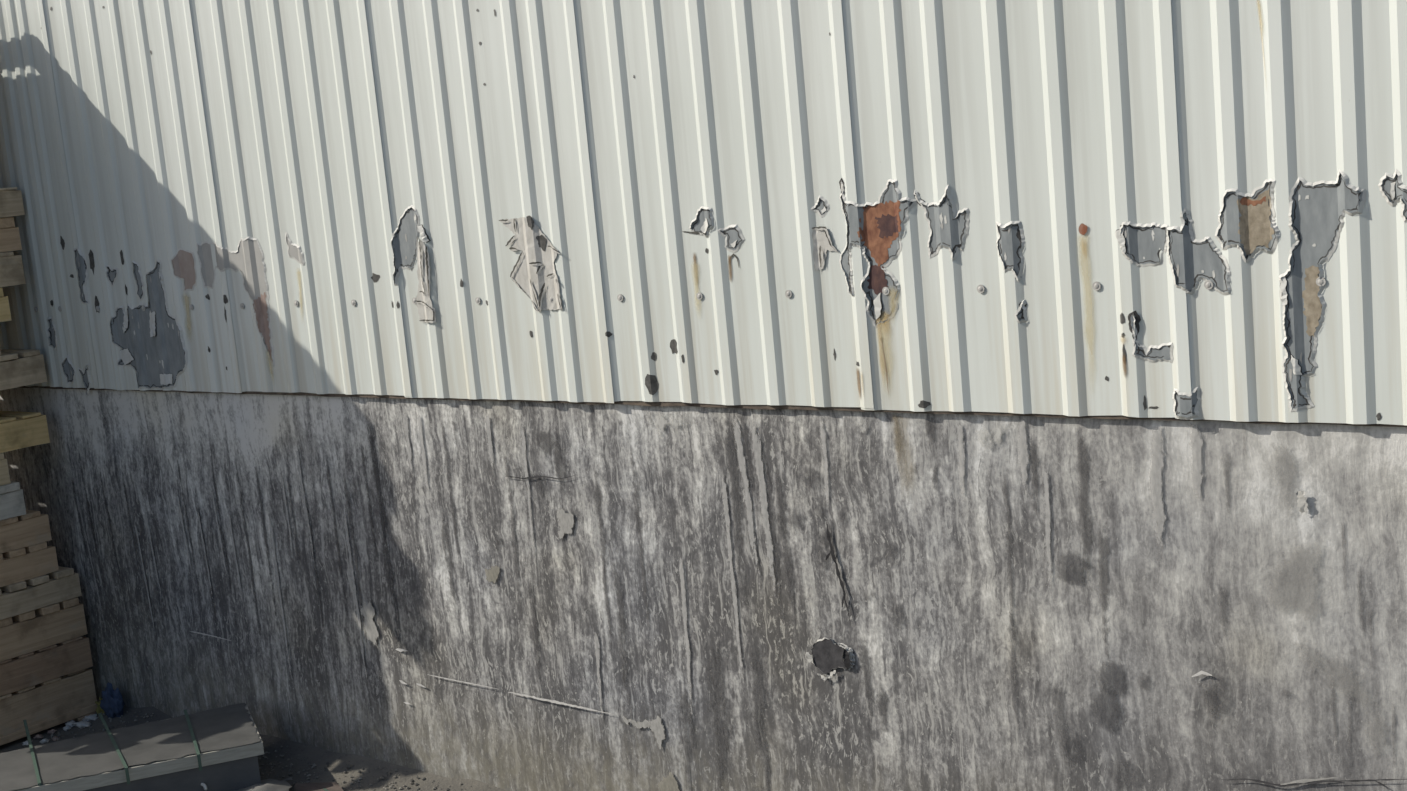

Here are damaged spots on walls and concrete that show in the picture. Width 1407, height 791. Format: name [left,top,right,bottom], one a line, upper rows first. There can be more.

peeling [60,236,275,390]
peeling [371,205,431,308]
peeling [810,178,970,342]
peeling [996,221,1025,282]
peeling [1115,169,1407,412]
water stain [486,416,566,691]
water stain [594,471,632,720]
water stain [679,557,695,790]
water stain [721,419,795,790]
spalling [806,638,855,680]
crack [826,524,850,621]
water stain [1002,420,1123,729]